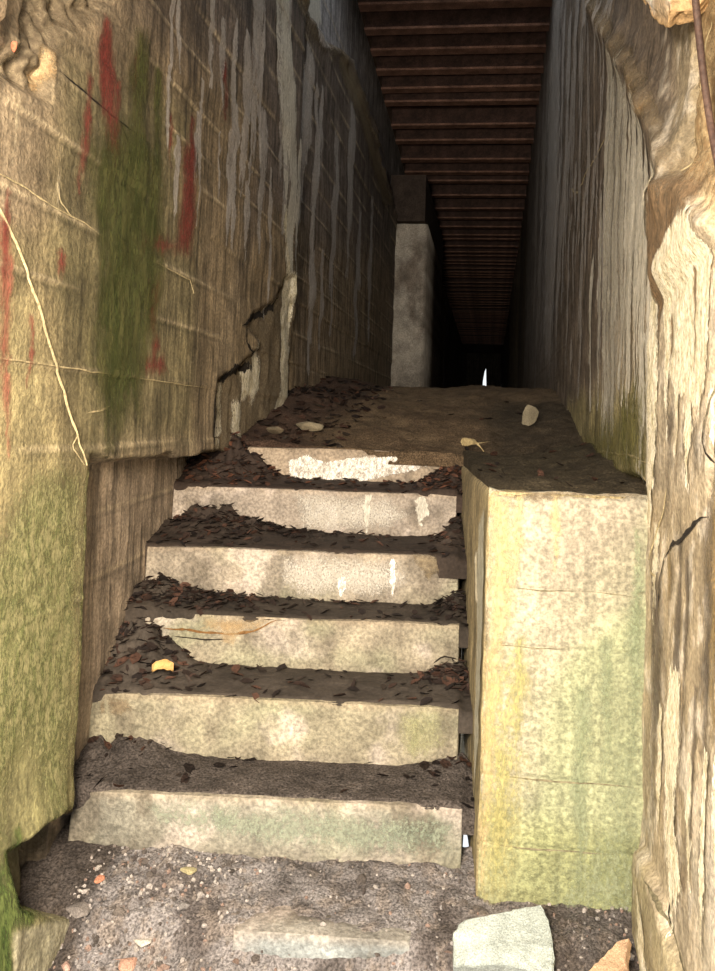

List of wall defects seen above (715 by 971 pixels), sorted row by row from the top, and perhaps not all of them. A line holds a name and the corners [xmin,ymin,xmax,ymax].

water stain [308,0,322,27]
crack [0,174,100,235]
crack [0,208,111,465]
water stain [81,19,174,391]
crack [157,262,194,293]
crack [140,296,279,442]
water stain [215,341,261,449]
water stain [275,0,302,409]
crack [699,384,715,463]
crack [509,450,706,602]
water stain [589,44,715,960]